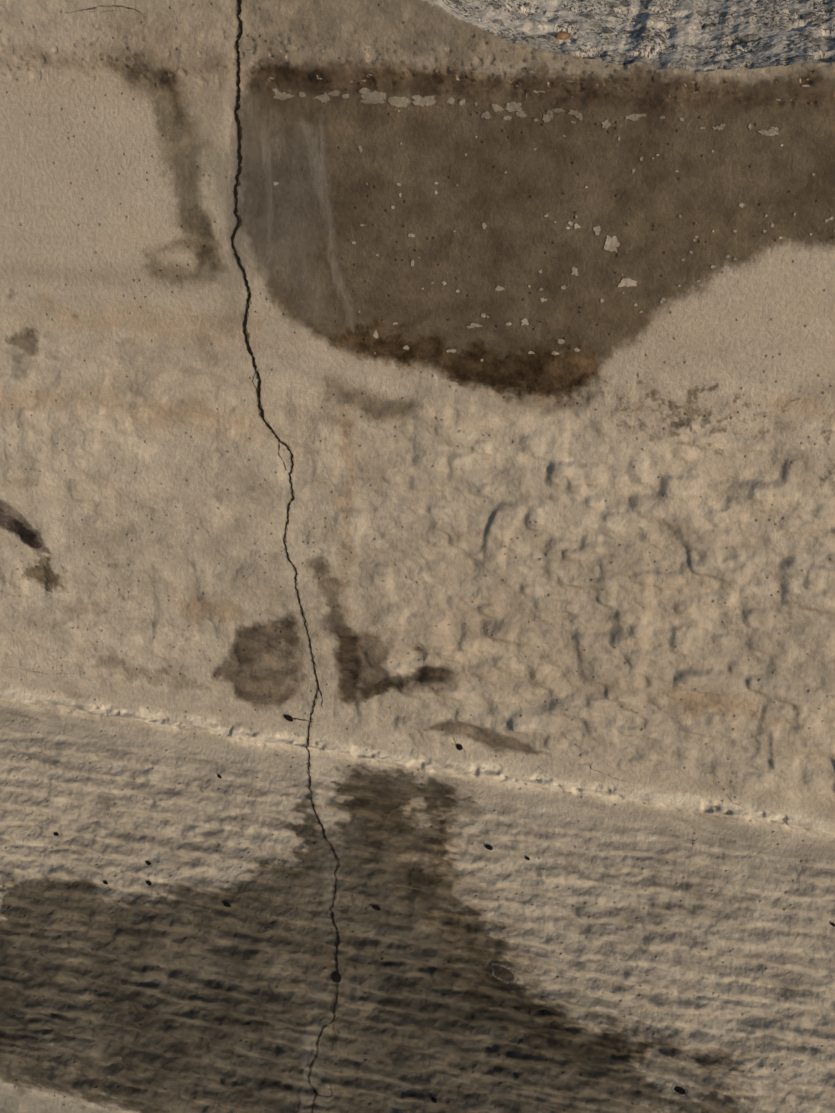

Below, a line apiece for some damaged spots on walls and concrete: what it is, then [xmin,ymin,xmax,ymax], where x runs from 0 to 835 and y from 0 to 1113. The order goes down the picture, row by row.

water stain [239,66,835,393]
crack [231,0,340,1112]
water stain [292,825,327,862]
water stain [336,797,400,834]
water stain [205,988,272,1051]
water stain [378,967,625,1080]